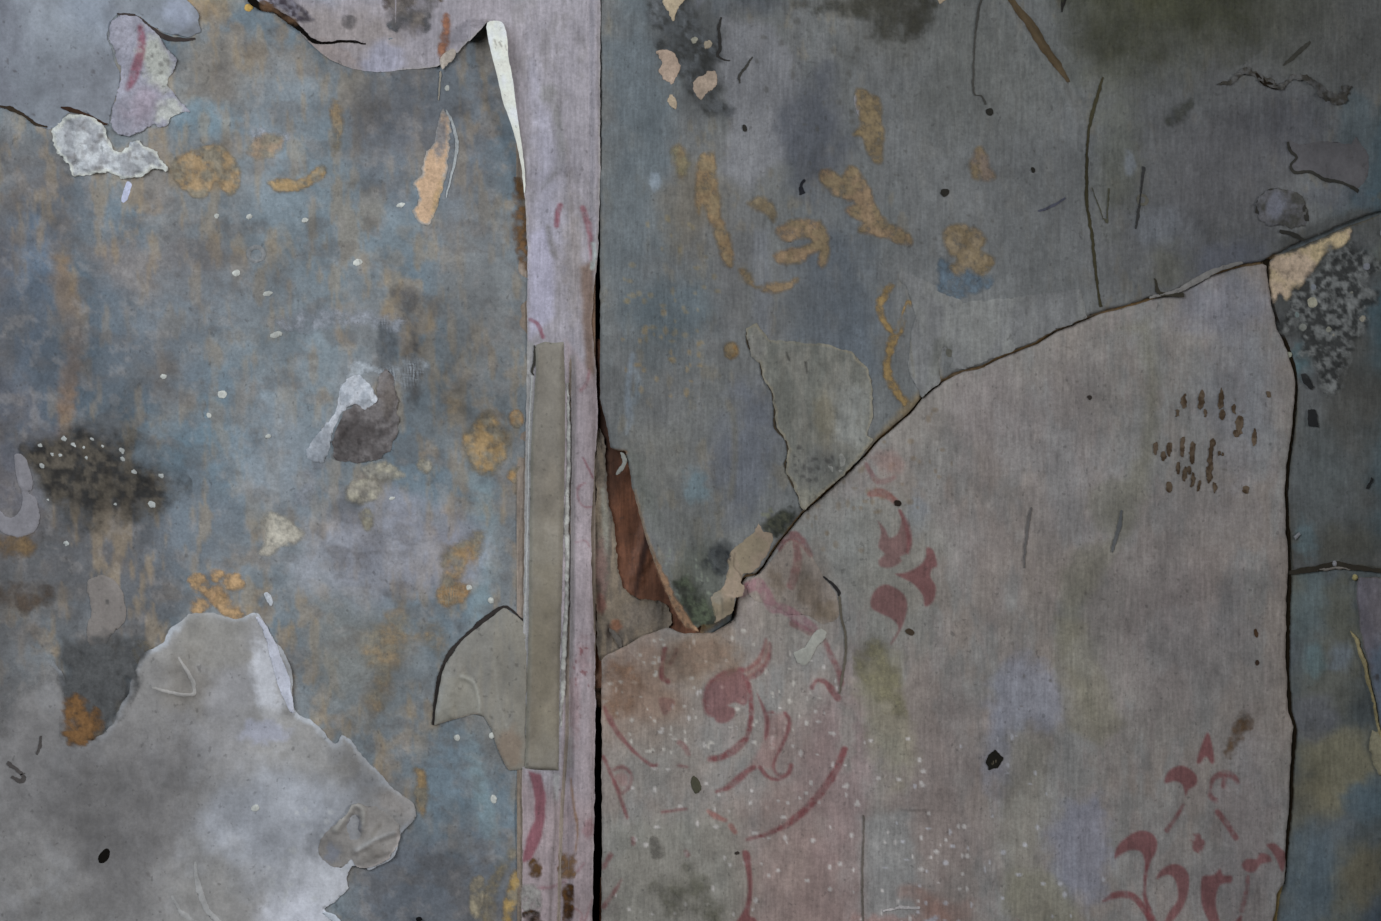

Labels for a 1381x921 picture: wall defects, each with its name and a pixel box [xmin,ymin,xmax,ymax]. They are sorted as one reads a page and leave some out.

peeling [0,0,283,198]
peeling [268,166,326,192]
peeling [0,570,427,921]
peeling [432,605,527,771]
crack [823,576,847,694]